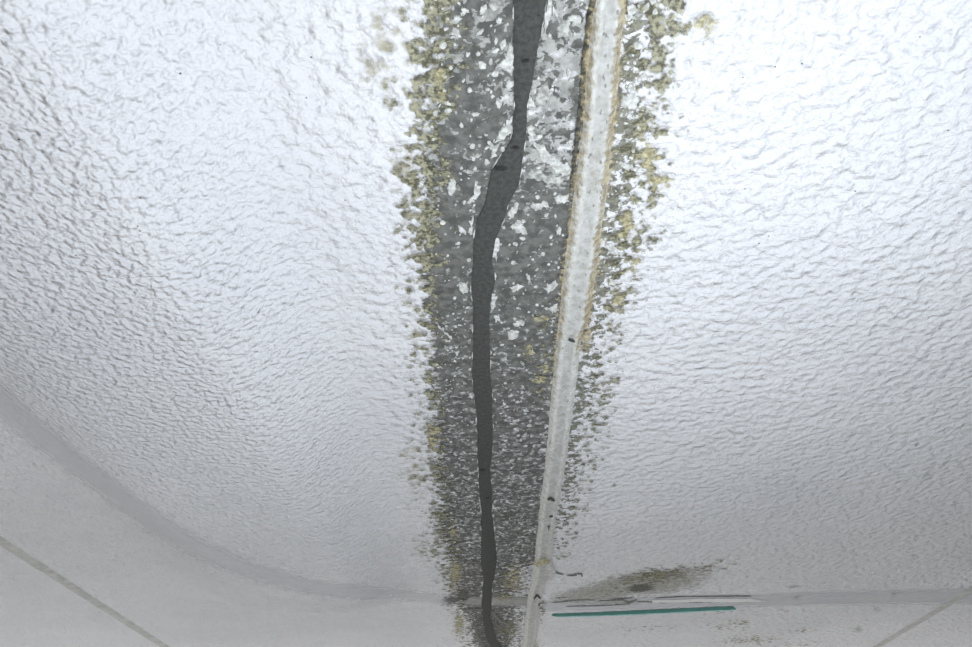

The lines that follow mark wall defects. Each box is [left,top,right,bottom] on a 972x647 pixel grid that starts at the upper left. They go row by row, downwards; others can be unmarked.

water stain [380,0,483,646]
crack [463,0,547,647]
crack [570,0,596,193]
water stain [532,0,715,568]
water stain [558,560,737,604]